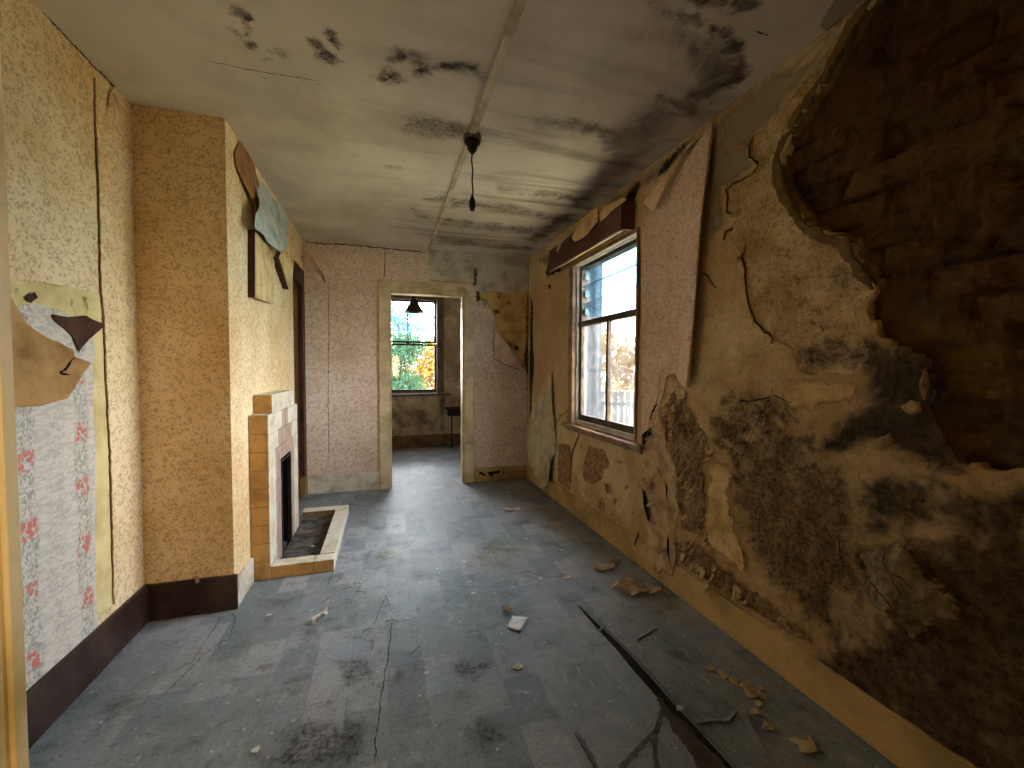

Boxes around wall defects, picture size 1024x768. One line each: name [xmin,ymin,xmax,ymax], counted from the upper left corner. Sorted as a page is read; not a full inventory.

damp [308,29,341,64]
damp [443,62,478,72]
damp [686,27,745,104]
flaking render [428,250,529,371]
damp [454,108,677,250]
damp [658,143,688,176]
crack [723,225,774,344]
flaking render [724,0,1024,471]
spalling [632,488,650,522]
flaking render [642,373,812,643]
damp [710,339,1024,768]
crack [374,620,393,763]